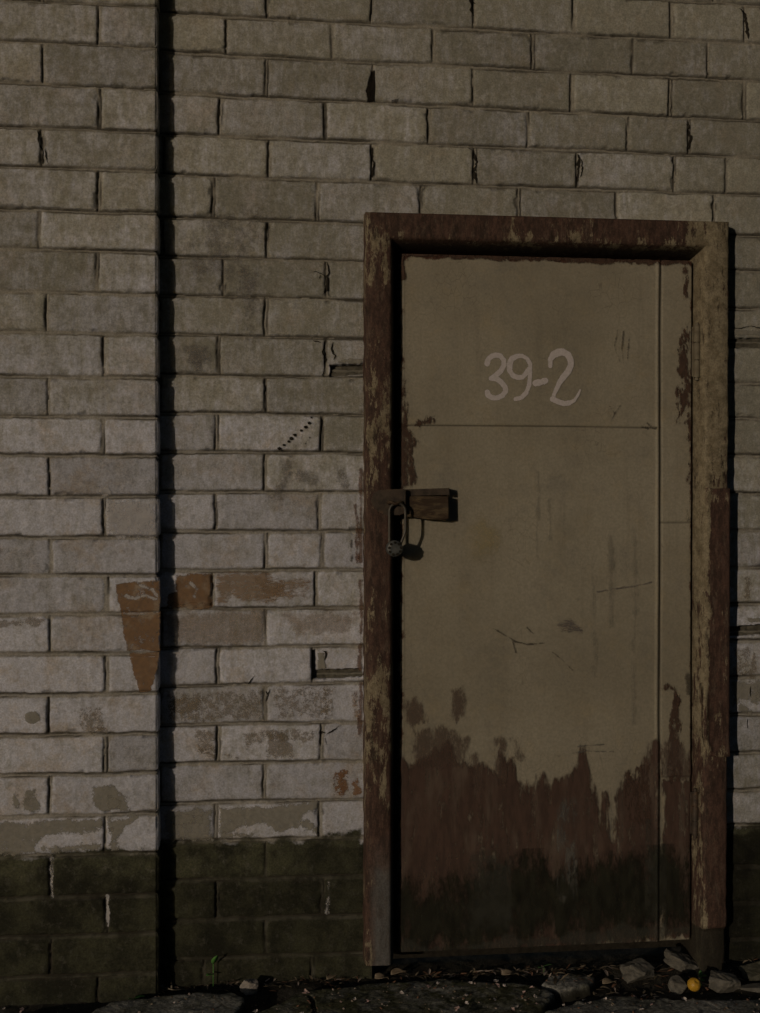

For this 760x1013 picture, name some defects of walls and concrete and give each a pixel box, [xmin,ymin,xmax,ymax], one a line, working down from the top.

spalling [317,653,363,678]
peeling [25,711,40,724]
peeling [0,785,139,856]
peeling [165,801,320,842]
corrosion [400,674,691,952]